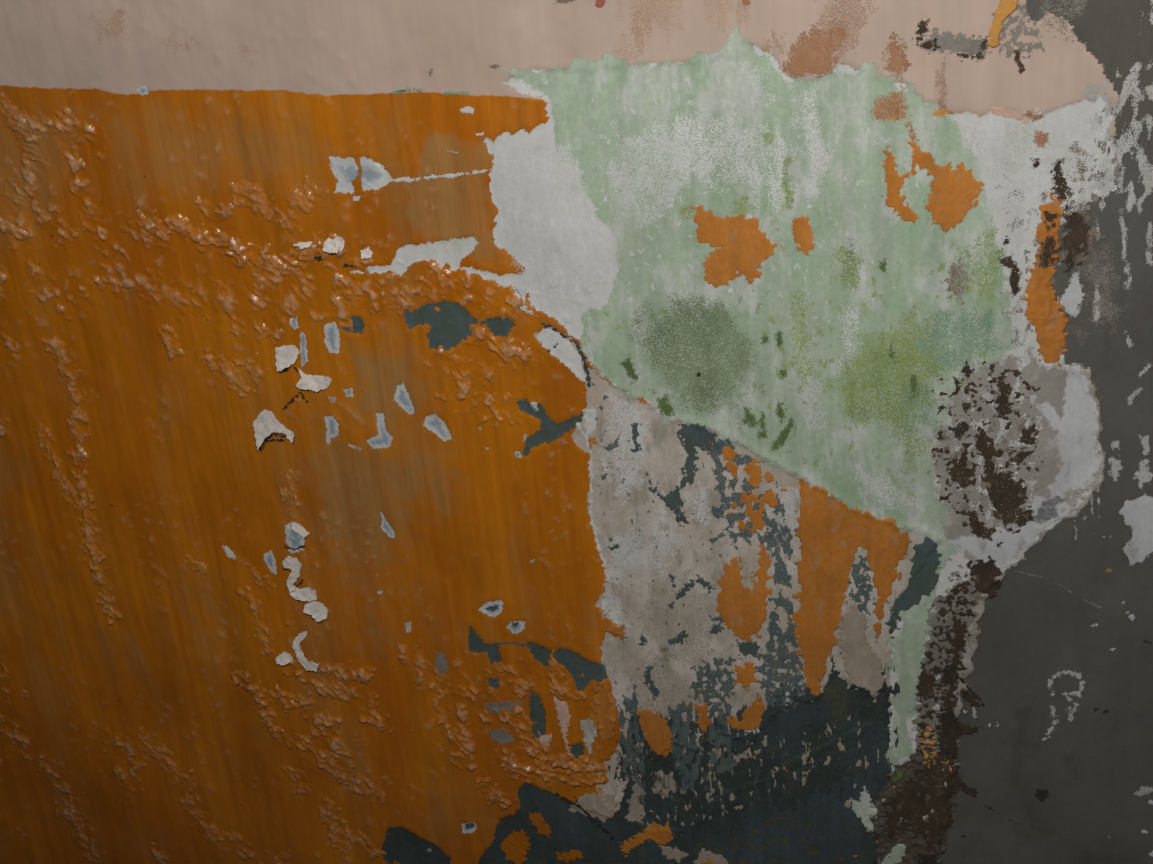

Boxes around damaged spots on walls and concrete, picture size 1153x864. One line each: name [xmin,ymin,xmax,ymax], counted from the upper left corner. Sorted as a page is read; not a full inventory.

peeling [253,316,393,451]
damp [619,290,783,420]
peeling [293,0,1153,864]